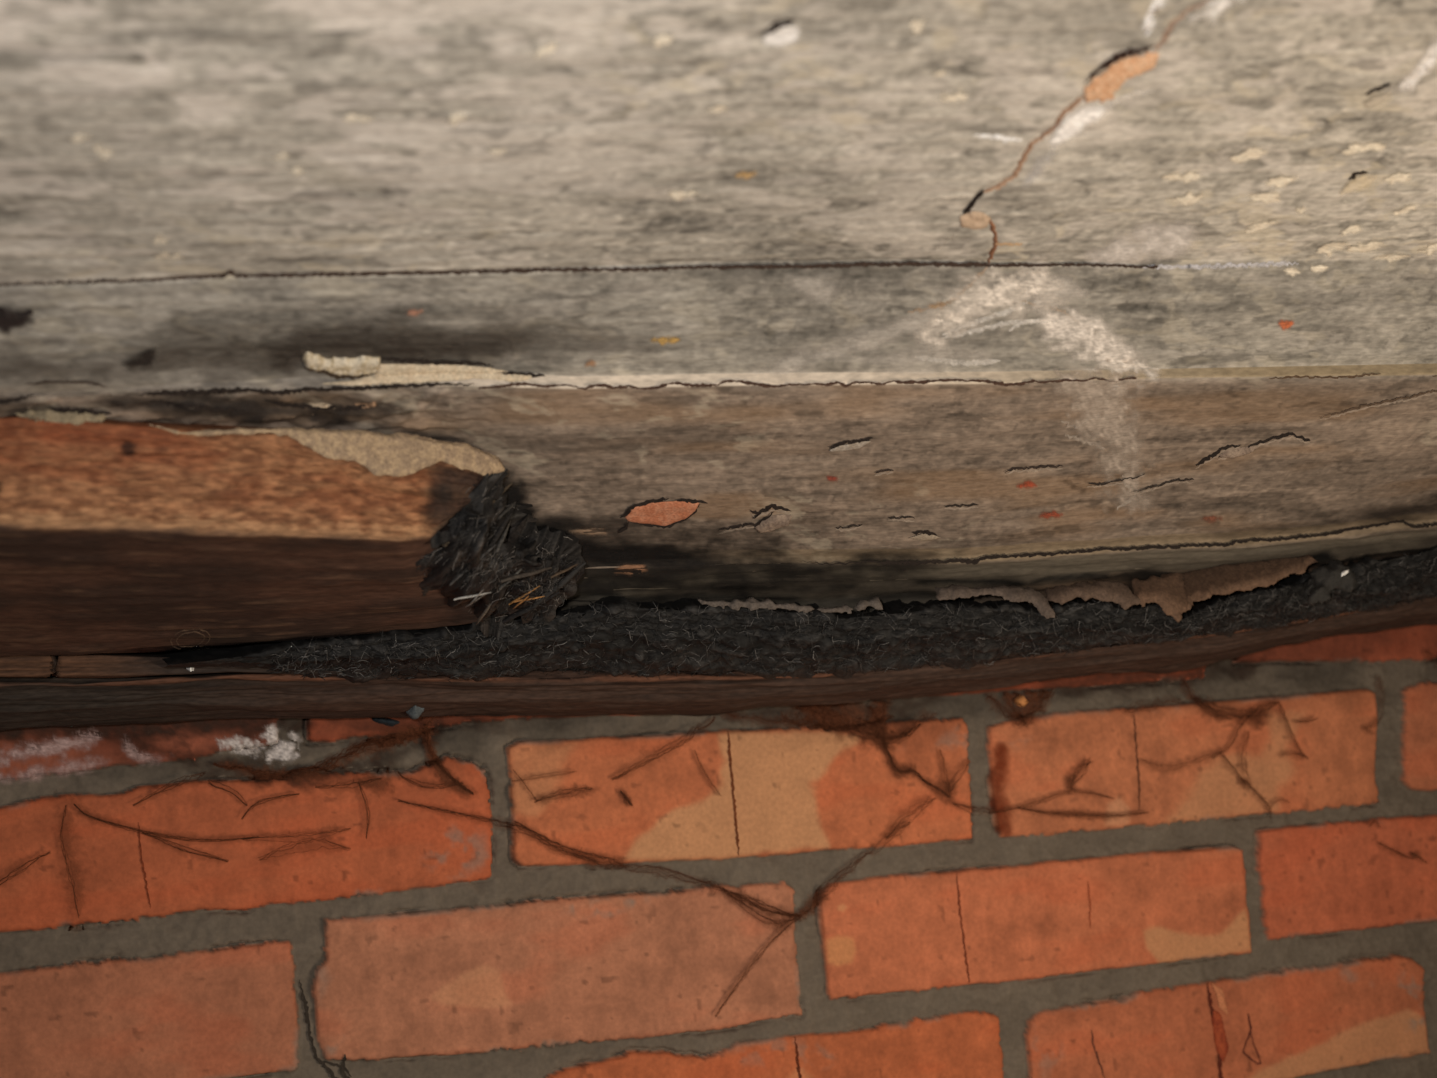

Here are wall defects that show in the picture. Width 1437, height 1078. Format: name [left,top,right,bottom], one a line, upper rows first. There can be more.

crack [0,0,1211,315]
crack [0,377,1137,404]
crack [1005,373,1437,494]
spalling [574,497,708,535]
spalling [618,564,646,574]
peeling [698,596,883,614]
peeling [935,554,1317,622]
leakage [0,718,305,780]
crack [728,732,740,855]
crack [956,873,970,983]
crack [299,980,352,1078]
crack [1207,982,1229,1078]